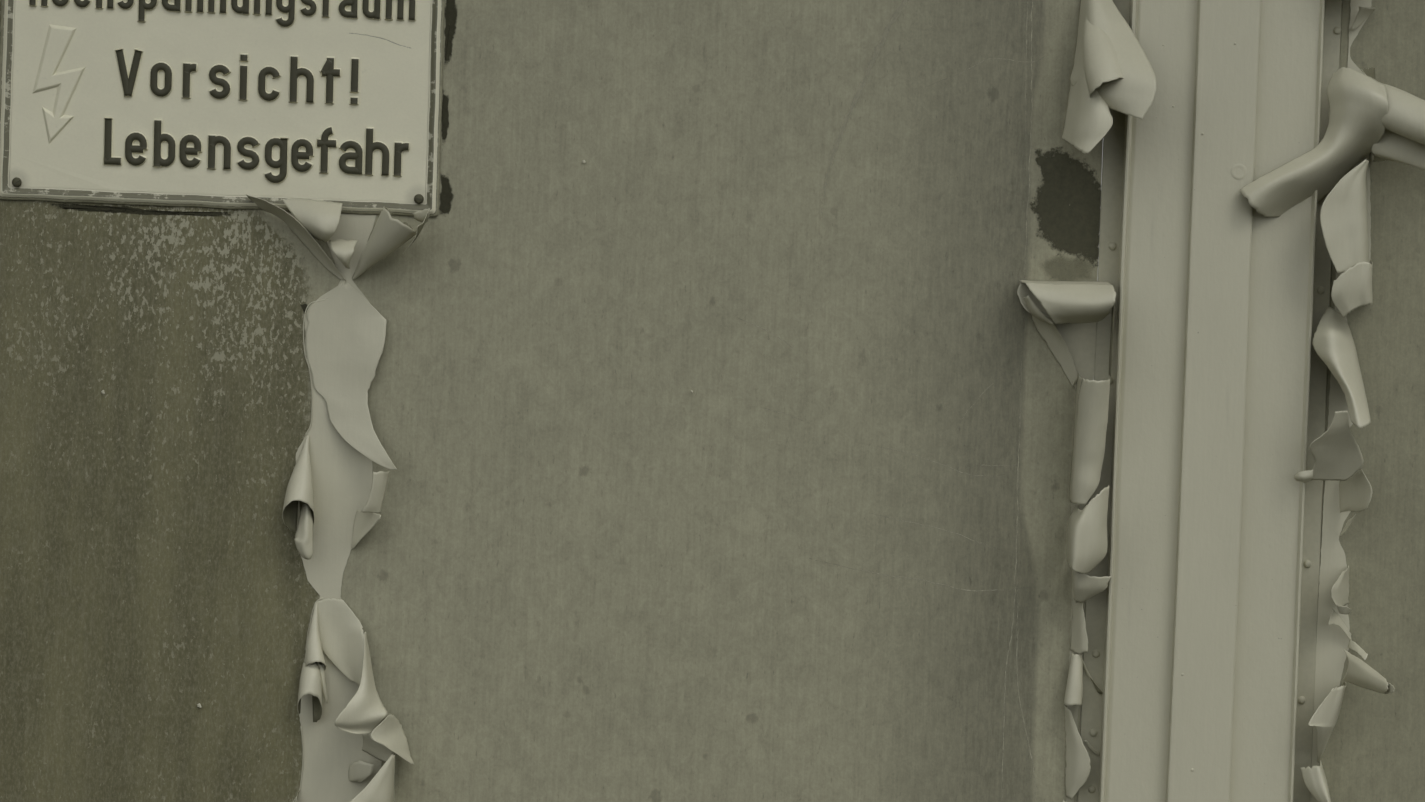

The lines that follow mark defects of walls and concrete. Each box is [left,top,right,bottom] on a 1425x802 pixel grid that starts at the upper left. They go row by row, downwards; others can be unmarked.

peeling [1062,0,1156,154]
peeling [246,194,430,802]
peeling [1017,280,1116,802]
peeling [1240,0,1425,802]